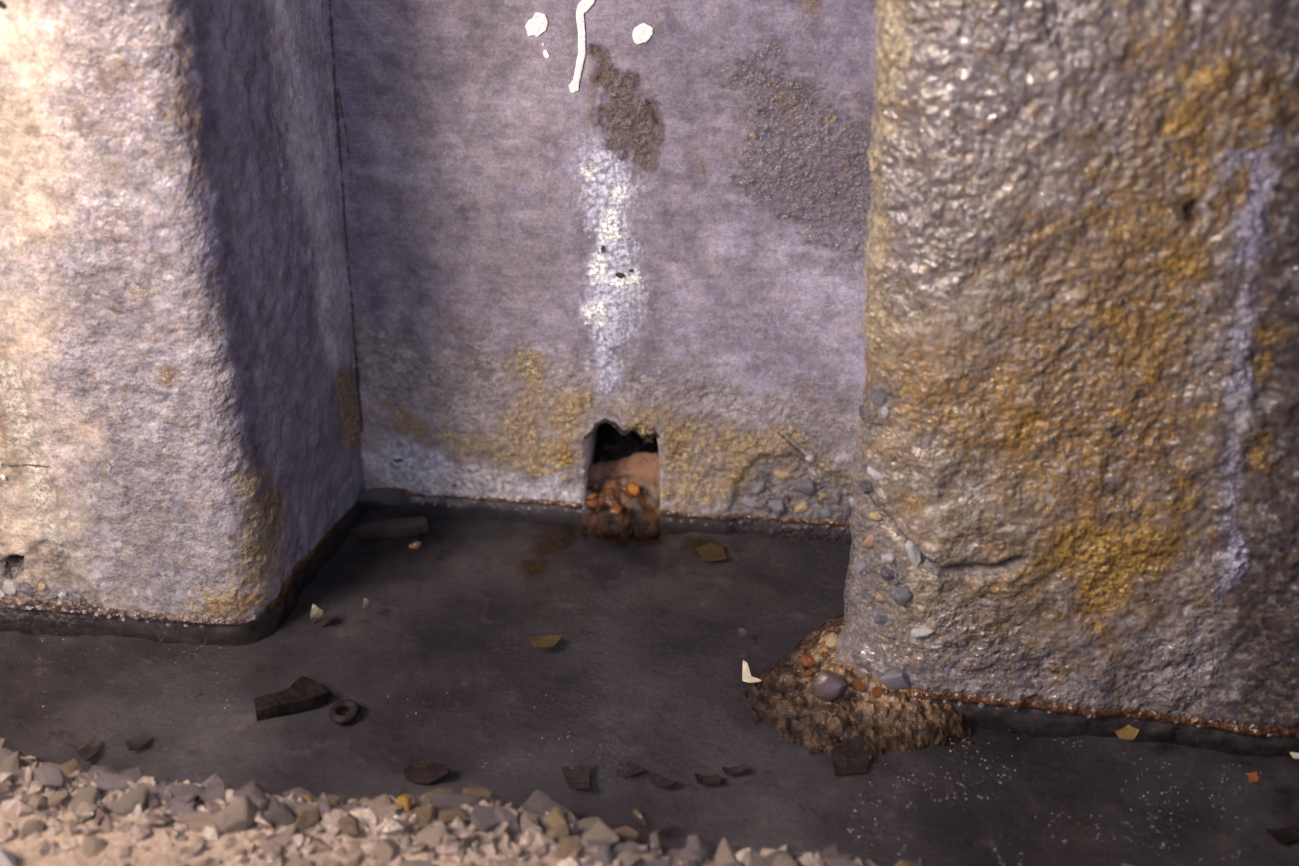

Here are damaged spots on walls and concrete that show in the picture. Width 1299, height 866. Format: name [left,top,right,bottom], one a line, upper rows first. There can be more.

leakage [336,143,645,512]
spalling [583,418,659,440]
rust [864,6,1293,656]
rust [742,613,1299,757]